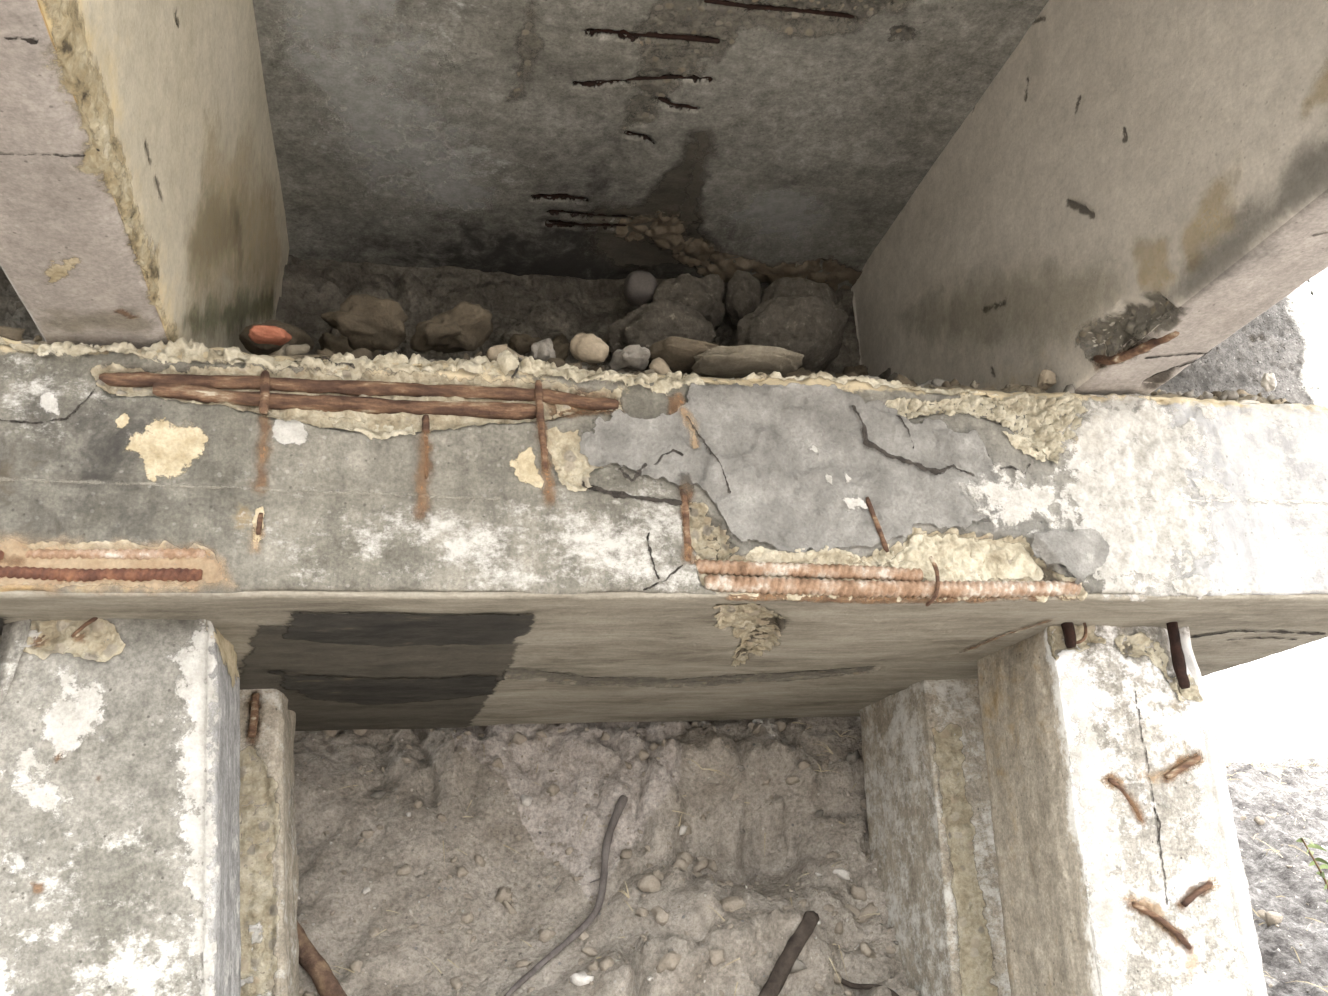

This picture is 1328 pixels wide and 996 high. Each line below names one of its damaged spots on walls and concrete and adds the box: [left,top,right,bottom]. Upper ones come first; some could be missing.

spalling [0,539,228,590]
spalling [0,0,999,550]
crack [643,532,683,590]
spalling [504,367,1234,688]
crack [852,405,1031,476]
spalling [1076,292,1184,368]
spalling [932,723,998,996]
peeling [1047,622,1204,996]
crack [1135,691,1168,905]
peeling [1147,728,1262,995]